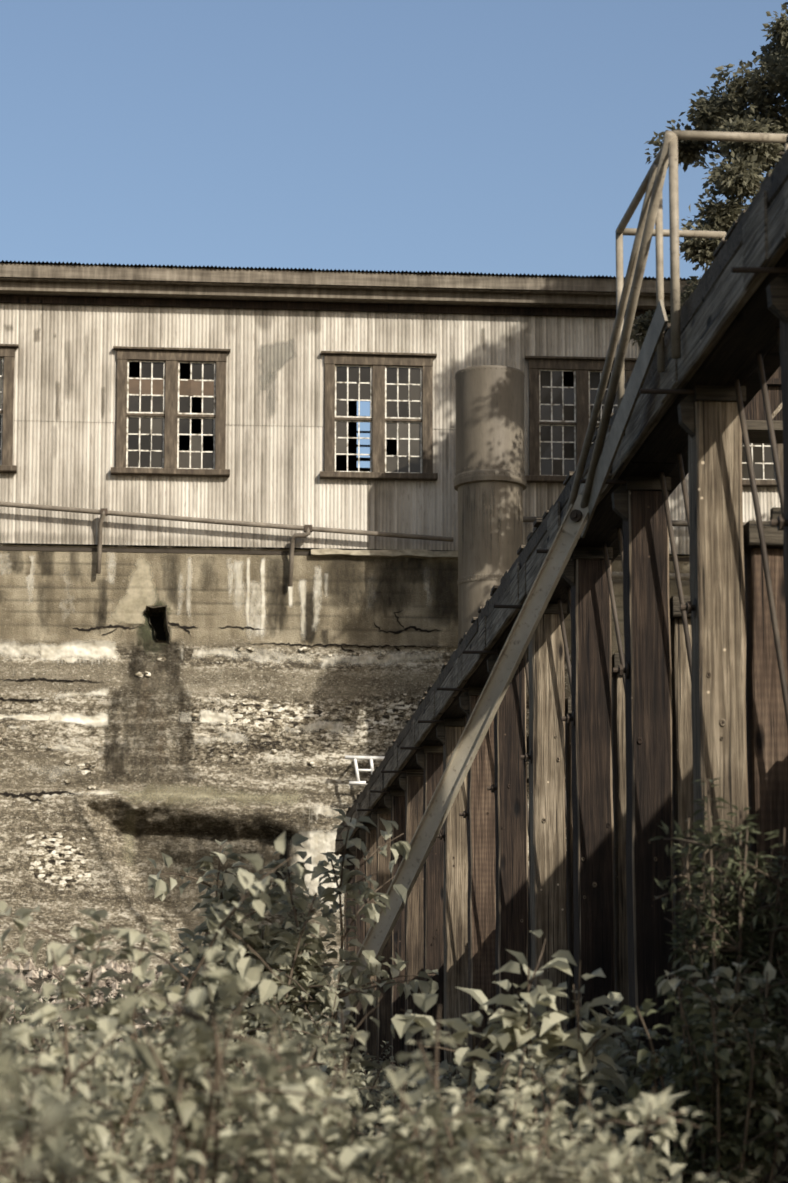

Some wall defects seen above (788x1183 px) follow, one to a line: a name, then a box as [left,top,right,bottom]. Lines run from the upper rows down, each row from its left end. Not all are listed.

water stain [0,640,118,665]
water stain [100,554,114,622]
peeling [110,558,170,662]
water stain [167,558,192,610]
water stain [130,614,309,685]
crack [73,610,452,652]
water stain [228,558,458,667]
water stain [180,695,245,755]
water stain [284,721,343,732]